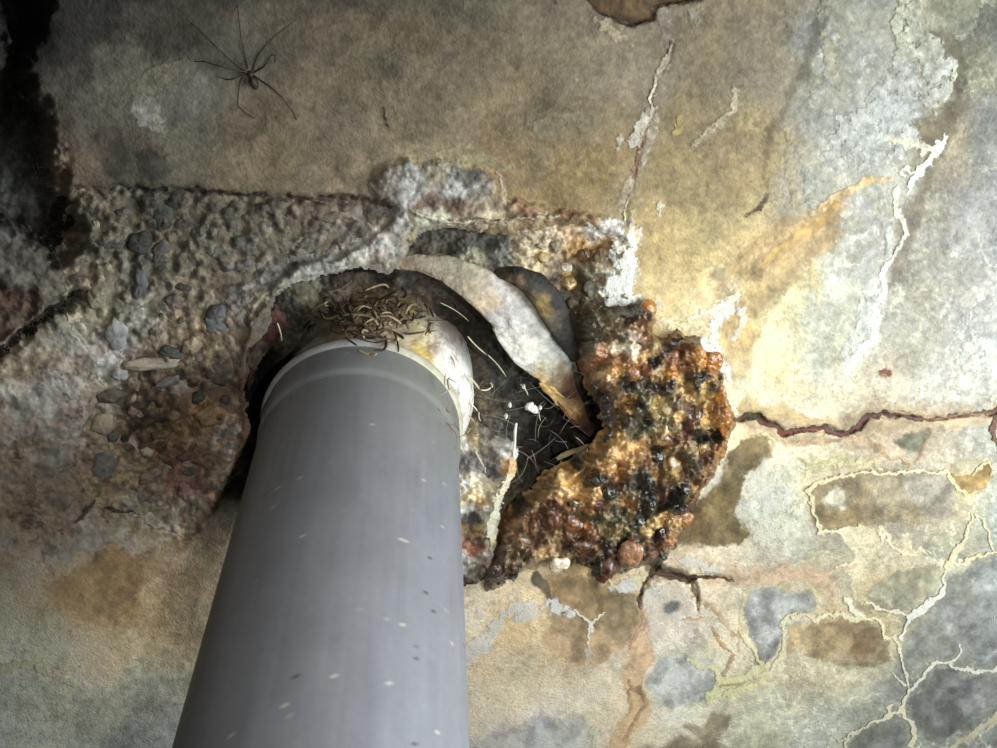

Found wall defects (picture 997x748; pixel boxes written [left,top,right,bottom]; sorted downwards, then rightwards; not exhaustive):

leakage [46,544,144,626]
spalling [54,184,564,539]
spalling [459,407,519,585]
crack [637,563,746,688]
leakage [466,209,997,666]
rust [712,176,893,380]
crack [733,408,997,446]
leakage [799,0,969,410]